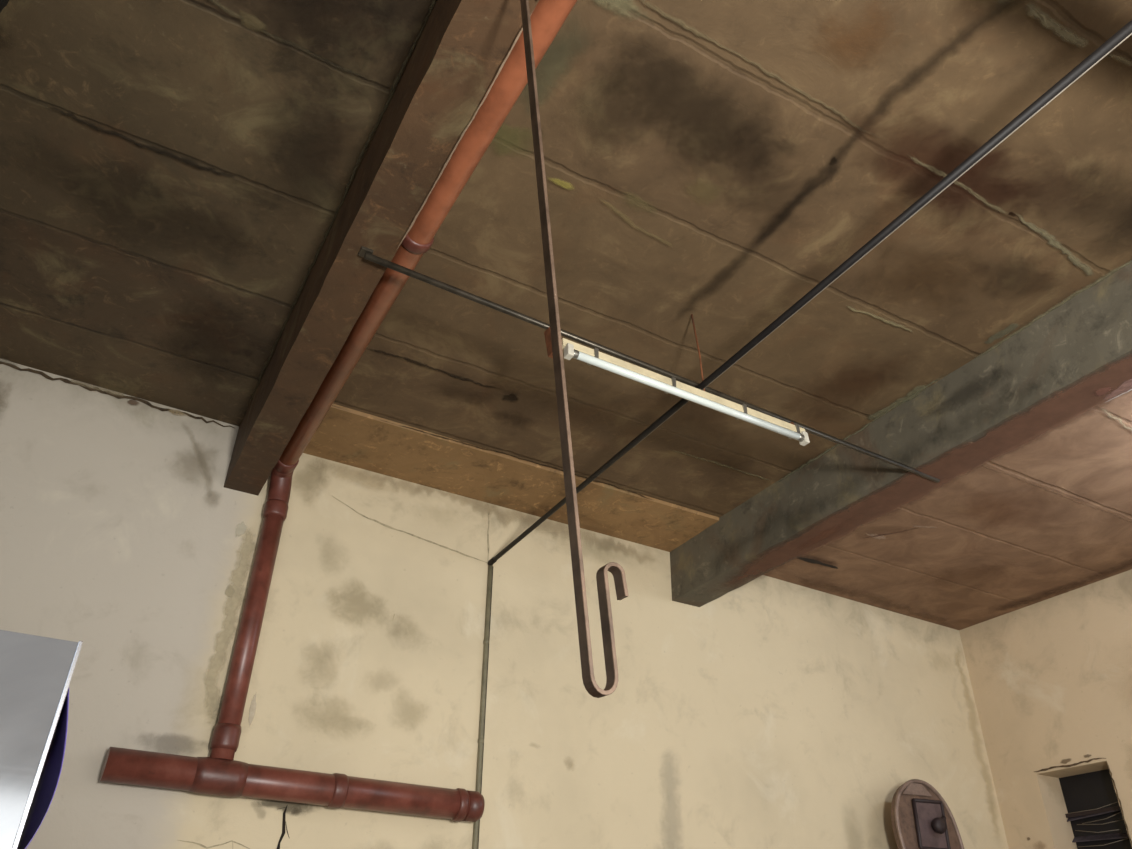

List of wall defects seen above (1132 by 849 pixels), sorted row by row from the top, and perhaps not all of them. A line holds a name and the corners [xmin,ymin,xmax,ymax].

peeling [1029,6,1086,46]
water stain [910,156,1005,213]
crack [178,840,250,849]
crack [277,807,289,849]